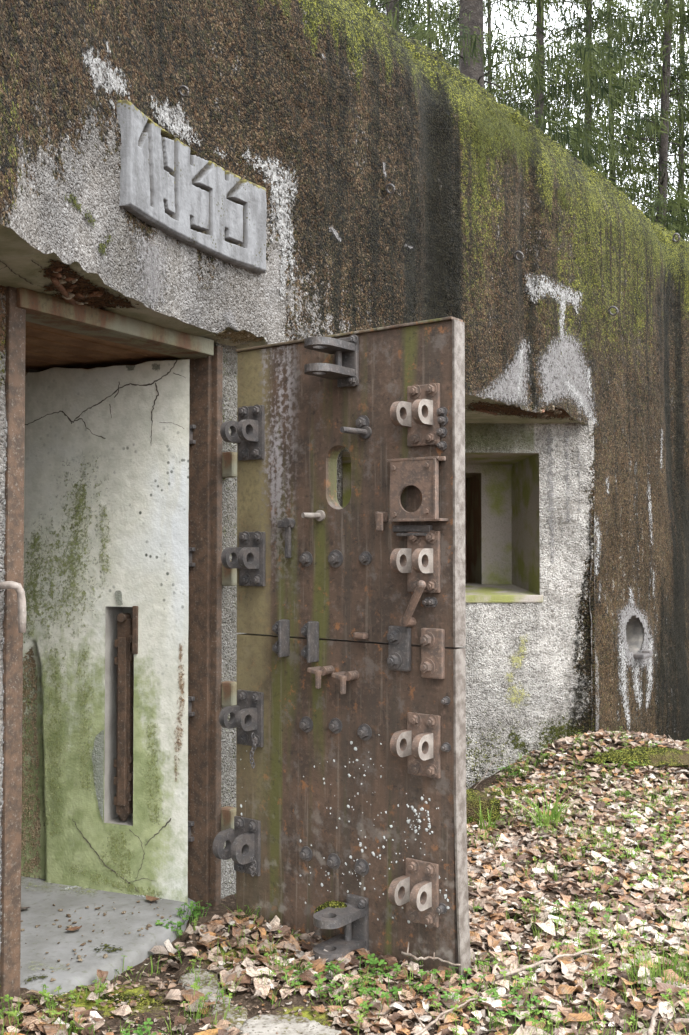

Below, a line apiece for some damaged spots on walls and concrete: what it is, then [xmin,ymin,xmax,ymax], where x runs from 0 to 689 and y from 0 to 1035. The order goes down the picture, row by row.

water stain [82,42,130,115]
water stain [151,96,200,146]
spalling [38,259,139,310]
water stain [474,129,597,427]
crack [25,360,184,440]
spalling [465,401,573,421]
water stain [616,246,689,741]
water stain [68,484,86,598]
water stain [100,507,111,573]
water stain [24,532,41,634]
spalling [21,647,41,879]